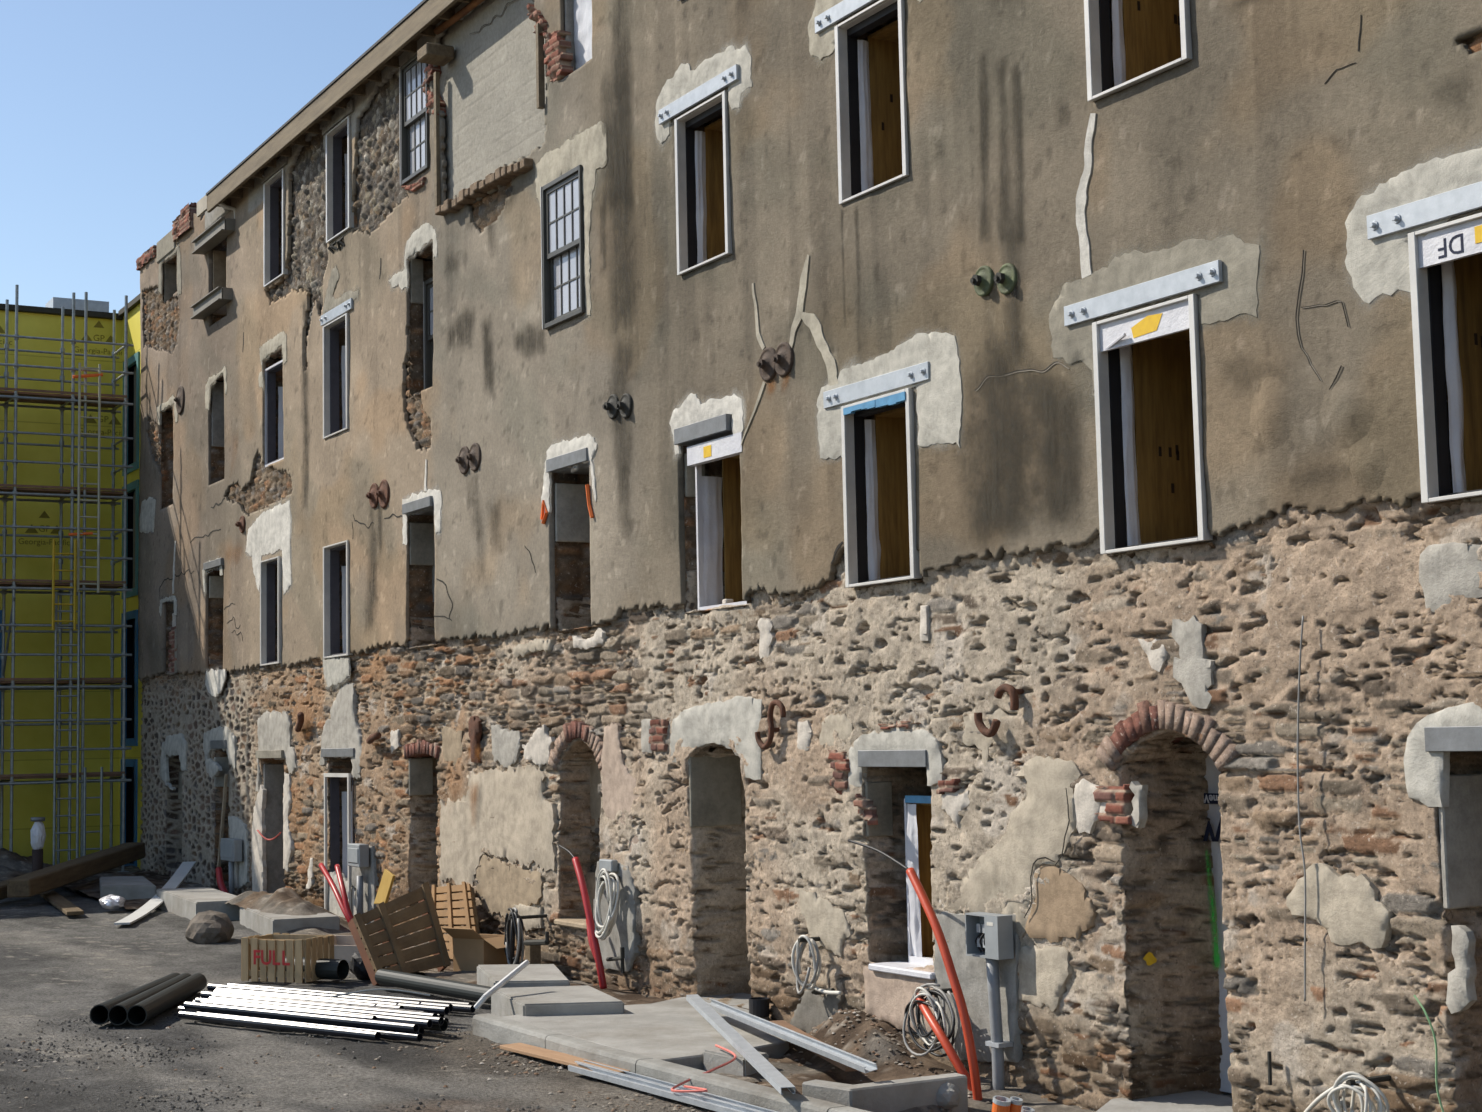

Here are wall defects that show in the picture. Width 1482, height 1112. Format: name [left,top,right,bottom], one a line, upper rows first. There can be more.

crack [1324,15,1362,84]
spalling [353,71,408,235]
damp [980,58,1021,262]
crack [1076,113,1097,278]
spalling [148,417,164,477]
spalling [143,287,180,353]
spalling [226,454,293,515]
spalling [405,285,432,449]
crack [741,254,839,445]
crack [1295,250,1350,390]